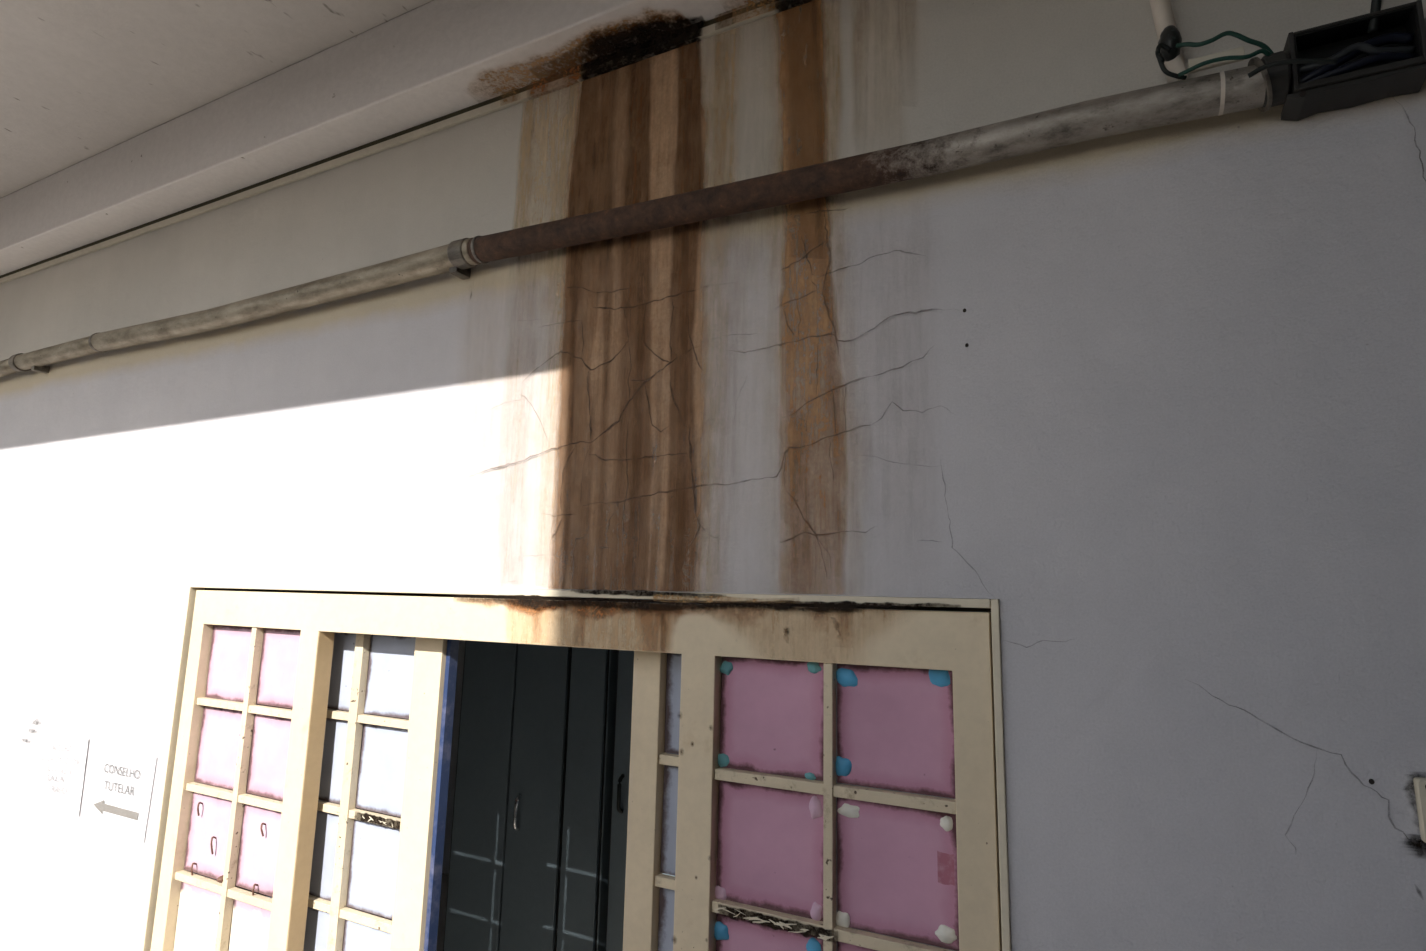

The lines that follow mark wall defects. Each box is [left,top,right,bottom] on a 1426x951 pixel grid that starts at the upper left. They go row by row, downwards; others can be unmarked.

corrosion [564,41,708,218]
water stain [479,0,814,102]
corrosion [776,0,829,171]
corrosion [478,221,709,651]
crack [491,210,932,579]
corrosion [781,197,844,562]